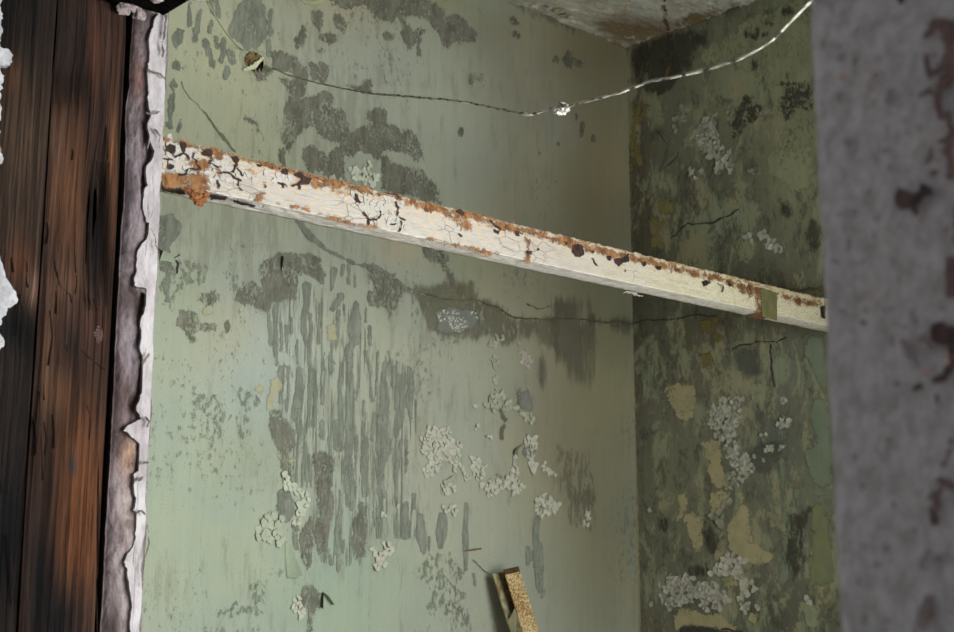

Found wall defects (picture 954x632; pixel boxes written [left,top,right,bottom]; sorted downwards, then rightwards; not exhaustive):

spalling [0,0,13,132]
water stain [632,30,706,95]
water stain [729,95,763,139]
water stain [779,74,814,121]
corrosion [161,137,762,316]
water stain [805,219,821,252]
spalling [0,260,18,349]
peeling [122,0,479,632]
corrosion [777,285,826,319]
peeling [226,252,562,632]
peeling [649,382,792,632]